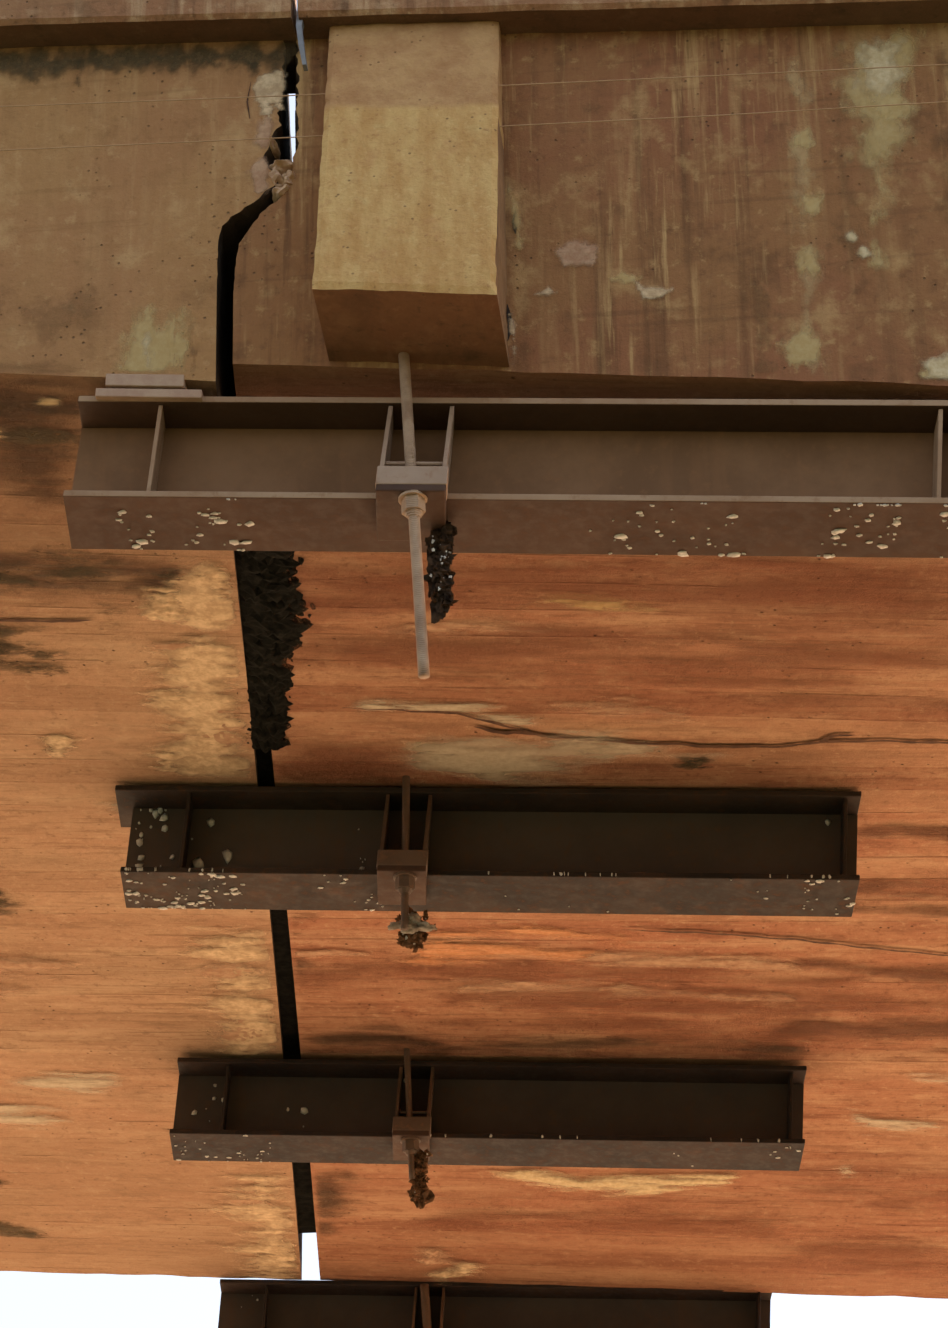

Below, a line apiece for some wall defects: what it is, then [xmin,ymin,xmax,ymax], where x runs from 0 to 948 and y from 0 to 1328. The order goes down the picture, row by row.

spalling [251,71,285,193]
damp [846,34,913,164]
damp [922,354,948,378]
damp [0,626,54,673]
spalling [142,566,250,777]
crack [342,707,948,748]